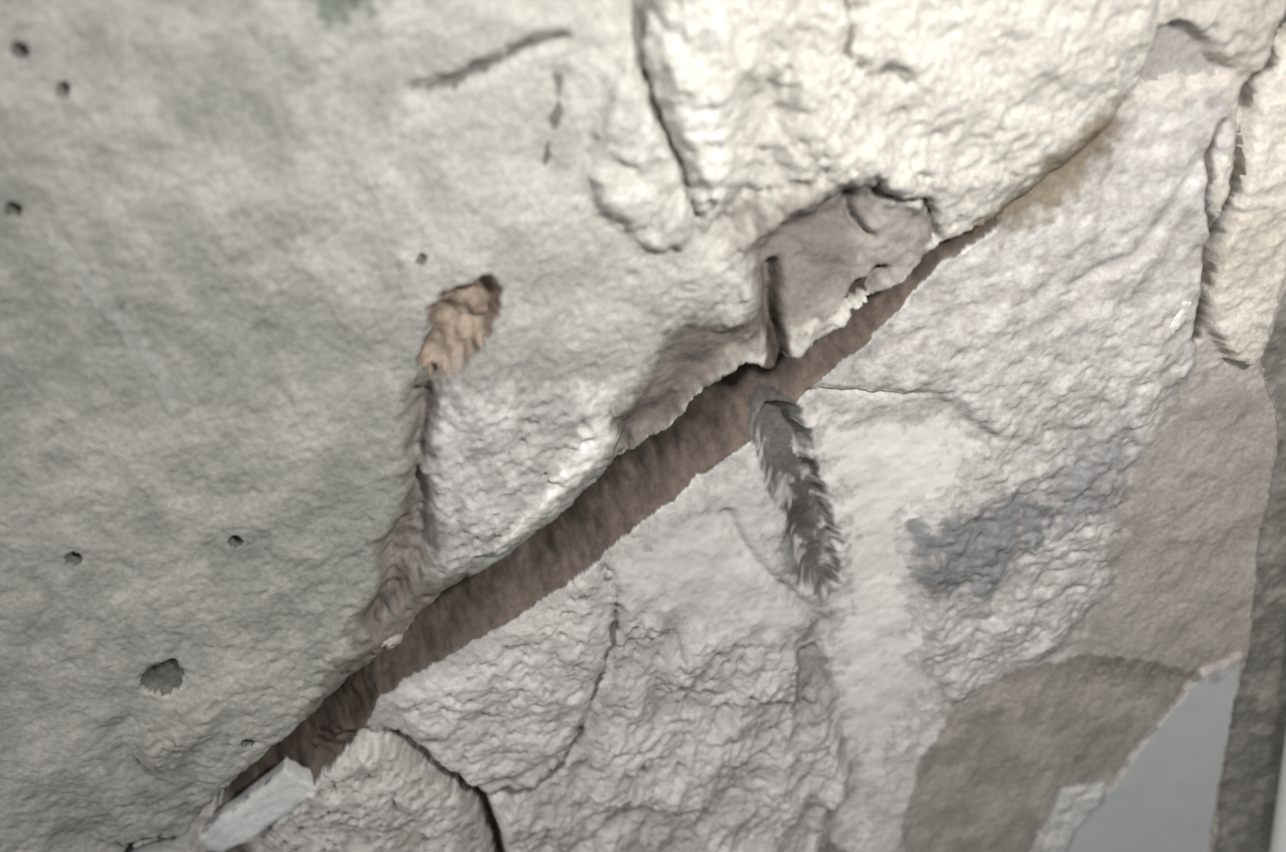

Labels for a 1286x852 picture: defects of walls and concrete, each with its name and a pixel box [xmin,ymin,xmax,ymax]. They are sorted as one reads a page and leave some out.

crack [426,32,567,88]
crack [543,73,563,164]
crack [632,0,691,198]
crack [1192,13,1286,338]
crack [200,182,998,852]
spalling [362,186,945,620]
spalling [844,20,1286,852]
spalling [197,756,317,852]
spalling [494,585,851,852]